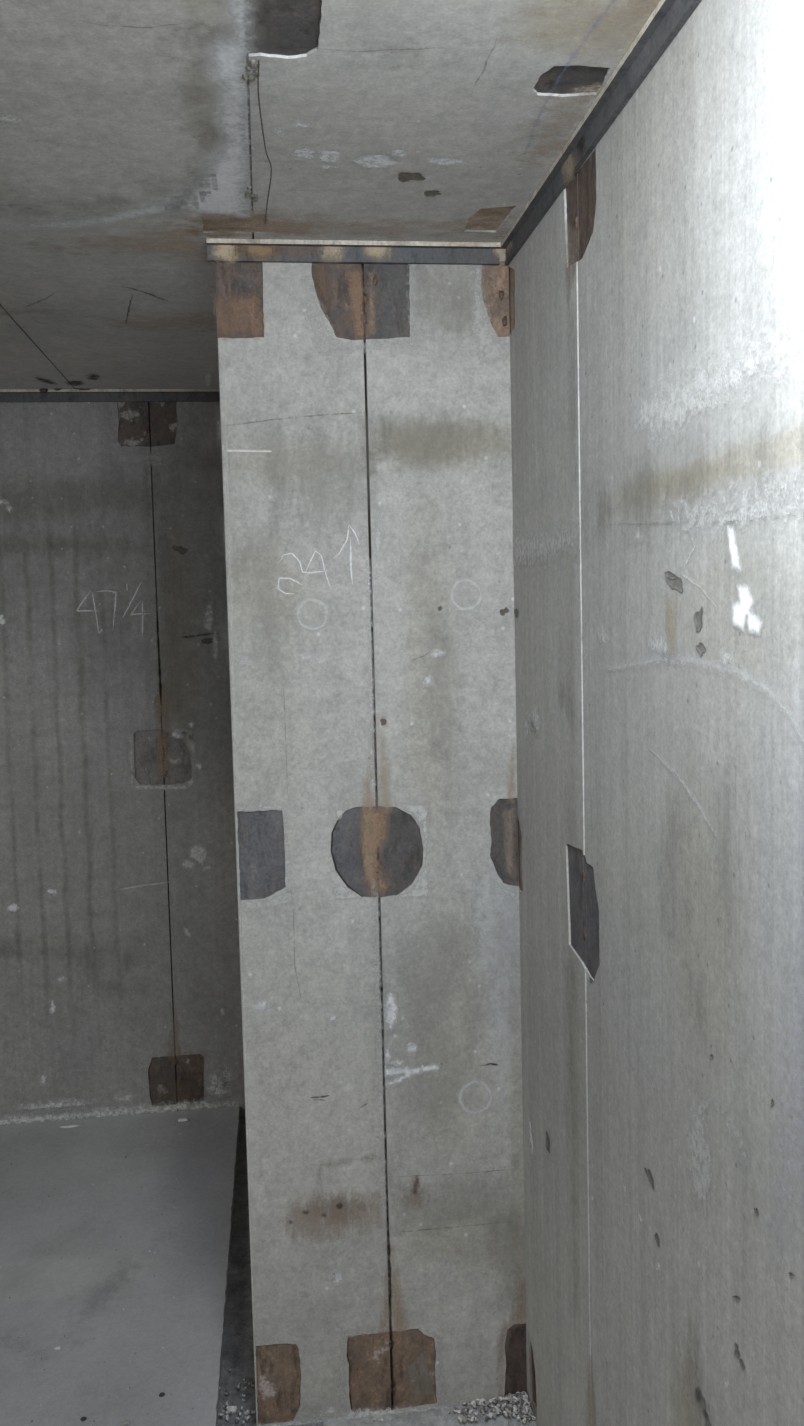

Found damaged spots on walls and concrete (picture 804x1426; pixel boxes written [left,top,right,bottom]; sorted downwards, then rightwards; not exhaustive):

rust [362,806,386,891]